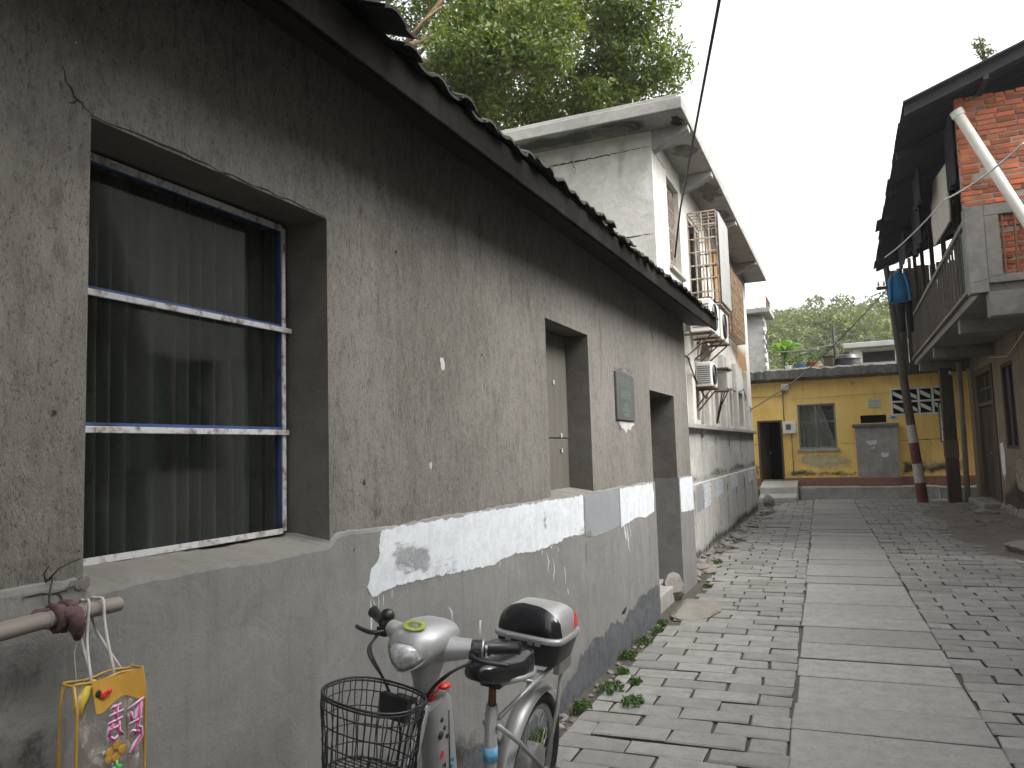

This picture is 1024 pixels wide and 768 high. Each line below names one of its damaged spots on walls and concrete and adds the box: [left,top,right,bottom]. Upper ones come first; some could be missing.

crack [62,65,325,217]
crack [551,146,665,173]
water stain [522,585,661,742]
water stain [455,744,483,768]